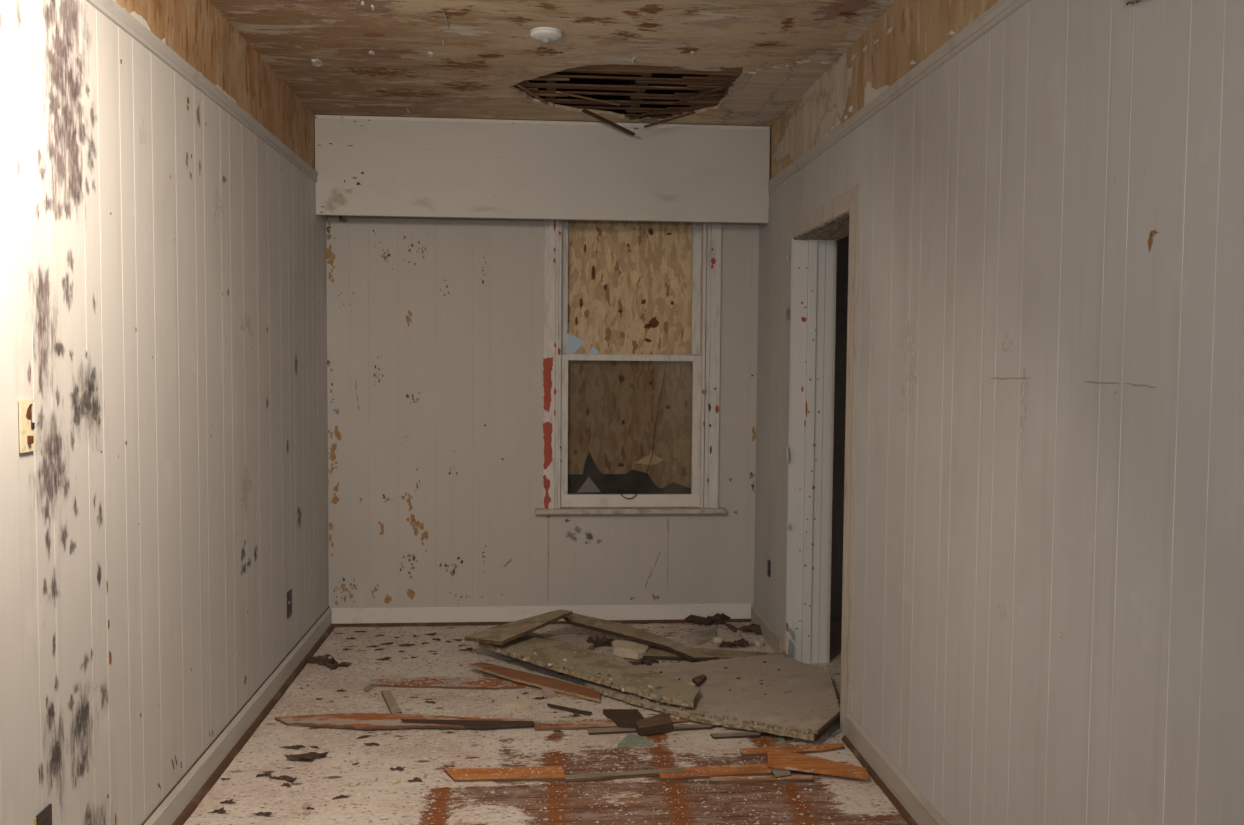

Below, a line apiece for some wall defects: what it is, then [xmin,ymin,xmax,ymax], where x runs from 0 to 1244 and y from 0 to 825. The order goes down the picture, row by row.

water stain [38,0,95,219]
water stain [323,46,503,114]
water stain [431,6,497,36]
water stain [508,0,817,71]
water stain [28,254,100,554]
peeling [327,354,341,504]
peeling [383,469,428,600]
water stain [39,685,106,804]